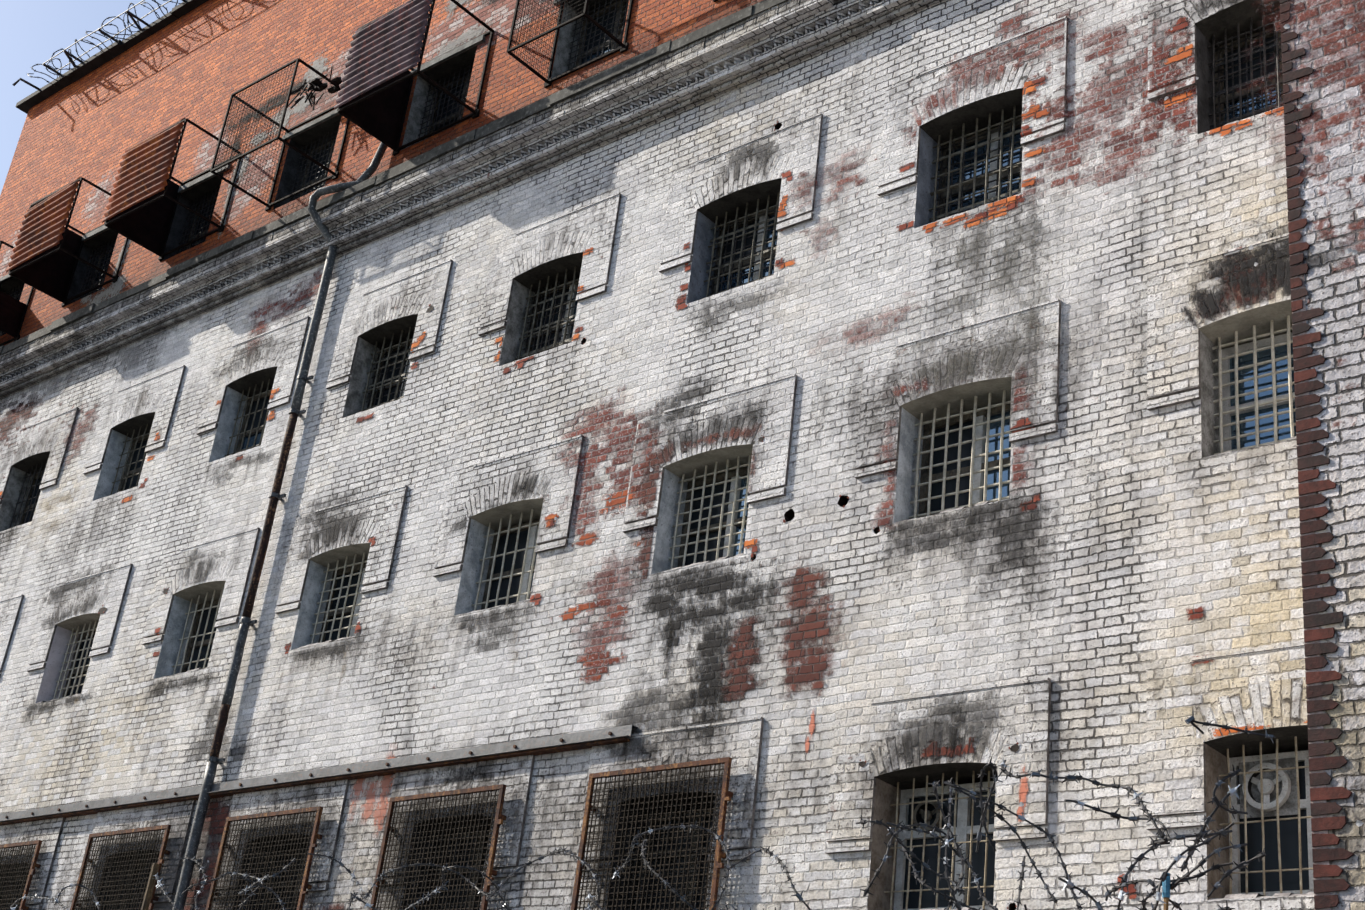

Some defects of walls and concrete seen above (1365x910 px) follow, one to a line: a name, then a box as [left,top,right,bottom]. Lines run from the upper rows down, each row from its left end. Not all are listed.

peeling [245,270,334,354]
peeling [873,420,896,531]
flaking render [894,0,1365,910]
peeling [545,386,764,683]
damp [887,494,1046,571]
peeling [720,616,760,701]
peeling [775,557,842,752]
damp [602,674,725,760]